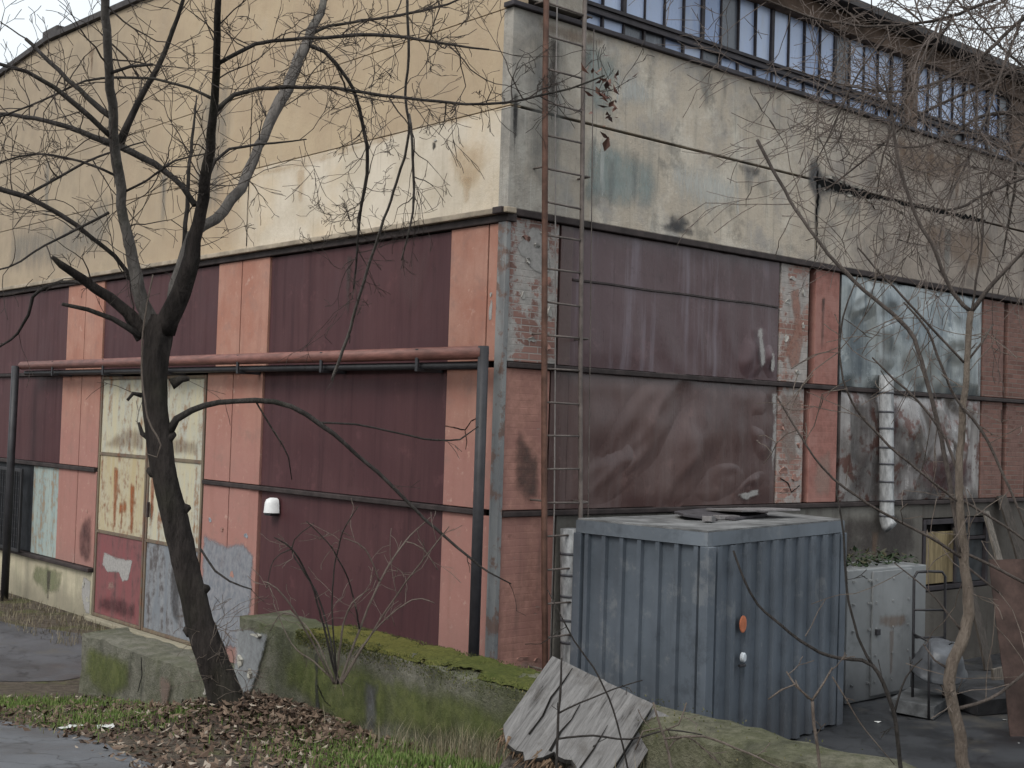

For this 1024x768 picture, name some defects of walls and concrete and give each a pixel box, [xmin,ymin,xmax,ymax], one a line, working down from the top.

leakage [666,217,690,232]
peeling [517,227,551,285]
peeling [785,276,806,374]
corrosion [114,470,134,528]
leakage [34,568,60,591]
peeling [102,553,132,581]
peeling [202,533,267,692]